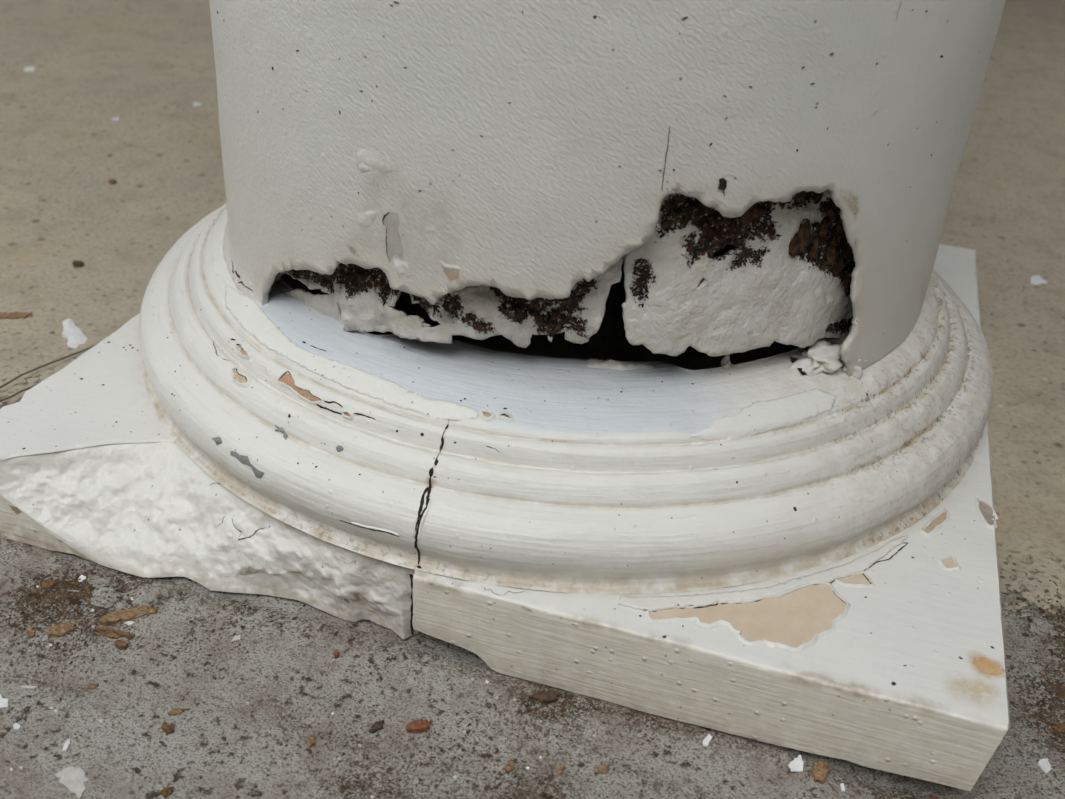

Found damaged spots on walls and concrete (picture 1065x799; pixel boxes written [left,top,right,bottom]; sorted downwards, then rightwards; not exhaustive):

peeling [382,211,412,280]
peeling [225,285,515,422]
spalling [0,437,419,639]
crack [340,422,449,635]
peeling [645,571,876,652]